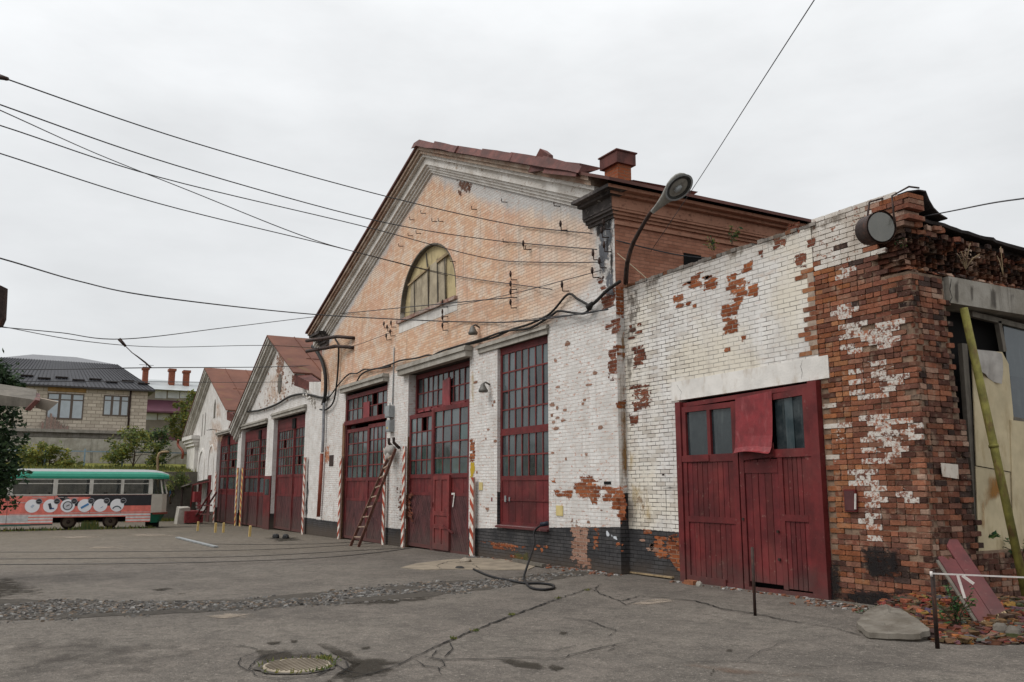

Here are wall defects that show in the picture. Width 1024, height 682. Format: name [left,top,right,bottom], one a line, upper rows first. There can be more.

peeling [616,384,652,426]
peeling [673,192,1024,604]
peeling [551,475,627,524]
peeling [569,518,599,569]
peeling [640,529,680,571]
crack [214,584,942,679]